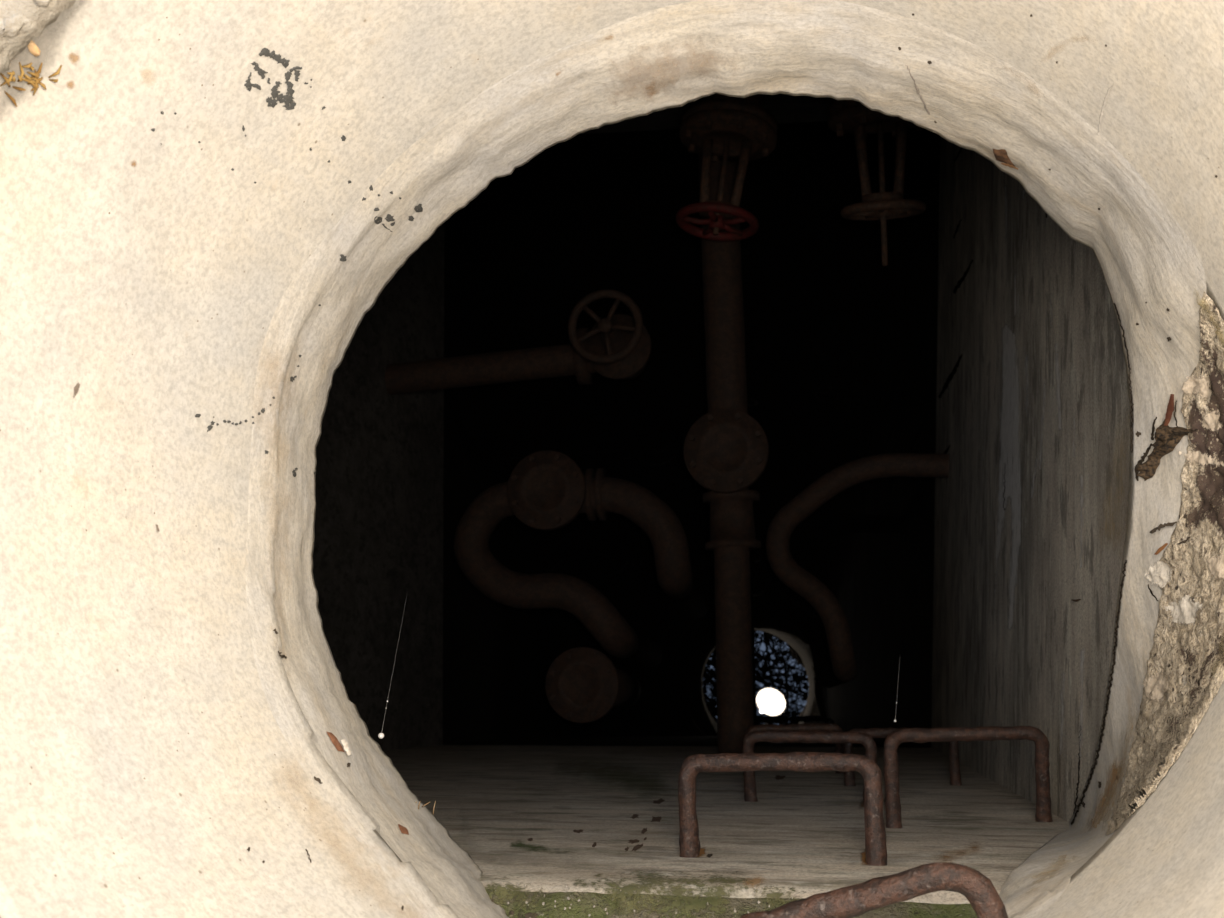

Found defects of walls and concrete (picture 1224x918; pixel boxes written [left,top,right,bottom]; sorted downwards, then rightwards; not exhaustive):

crack [1071,560,1158,825]
spalling [1105,292,1224,835]
crack [1150,521,1191,545]